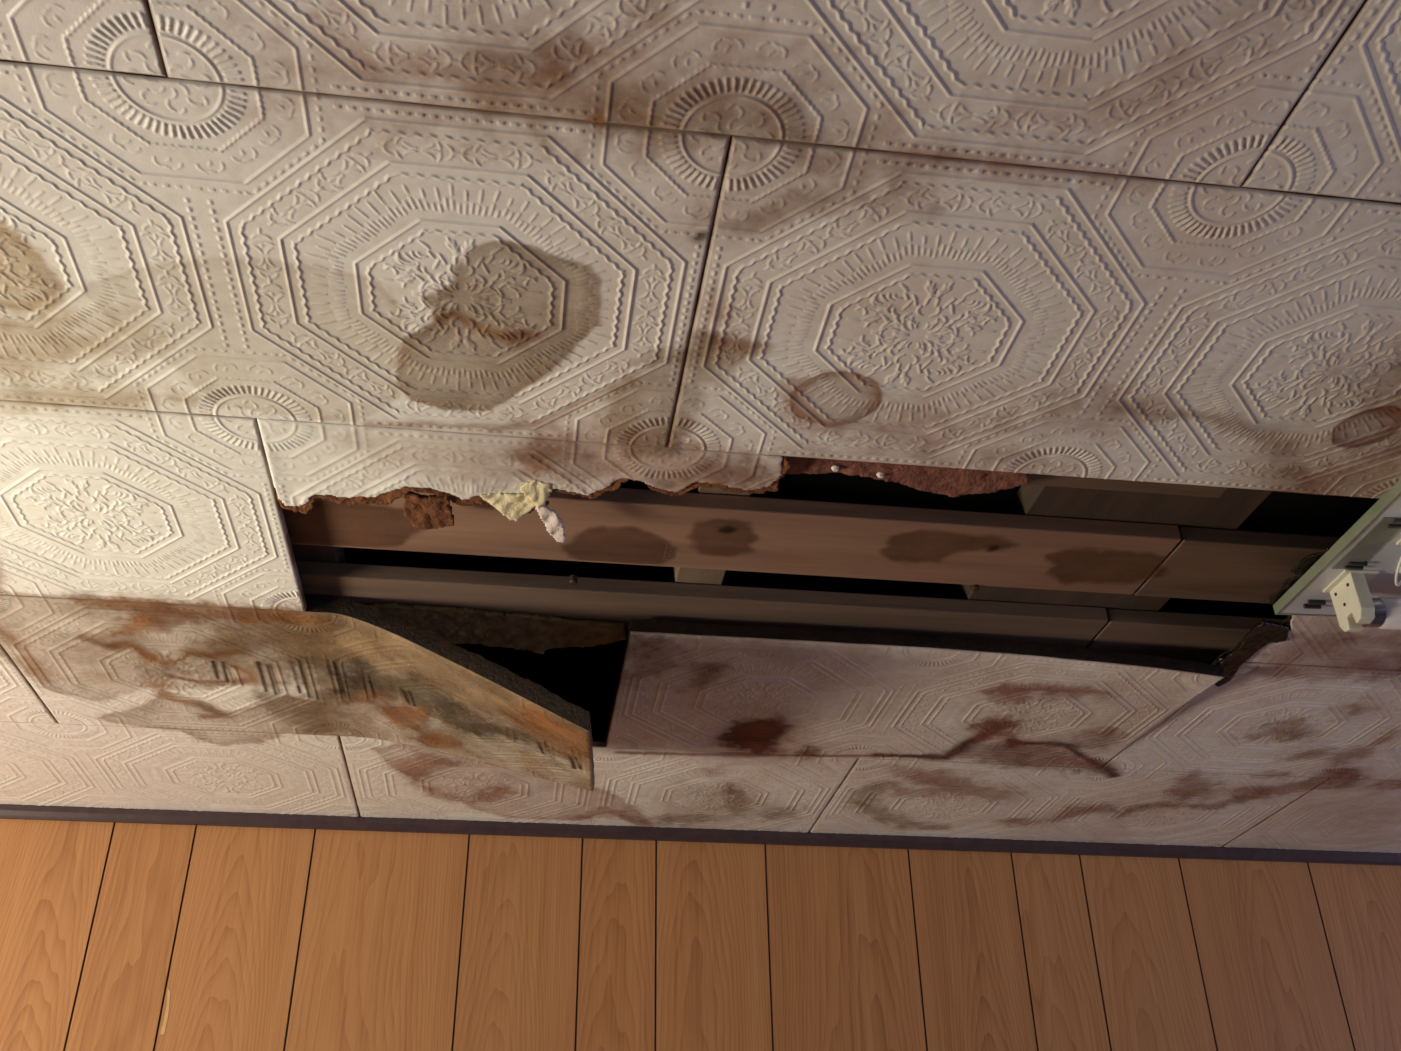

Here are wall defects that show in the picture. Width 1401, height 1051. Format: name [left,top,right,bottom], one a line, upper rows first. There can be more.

damp [398,242,599,410]
damp [790,372,881,423]
damp [1332,406,1401,448]
peeling [403,491,454,530]
peeling [481,479,566,543]
damp [989,685,1088,700]
corrosion [623,720,787,756]
corrosion [862,719,1118,777]
damp [1222,738,1386,805]